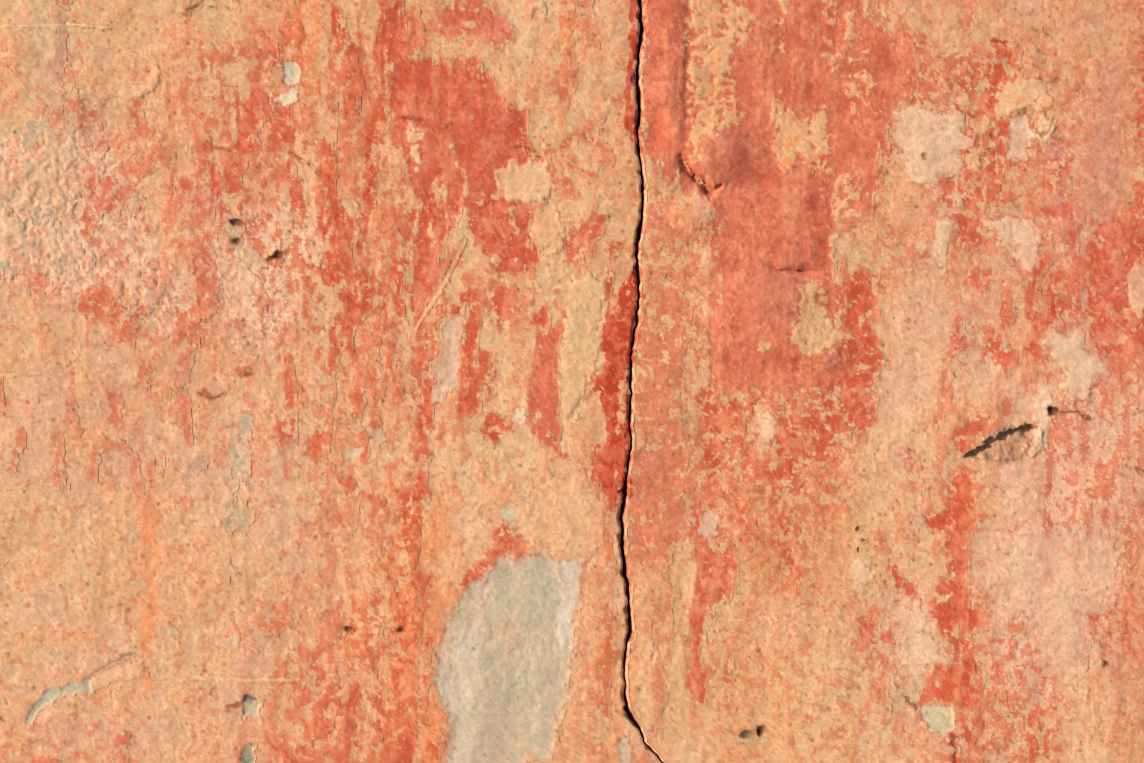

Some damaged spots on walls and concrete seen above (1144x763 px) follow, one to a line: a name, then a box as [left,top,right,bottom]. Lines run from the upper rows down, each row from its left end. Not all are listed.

spalling [23,652,149,725]
spalling [429,502,587,763]
crack [617,0,666,763]
peeling [873,375,1045,763]